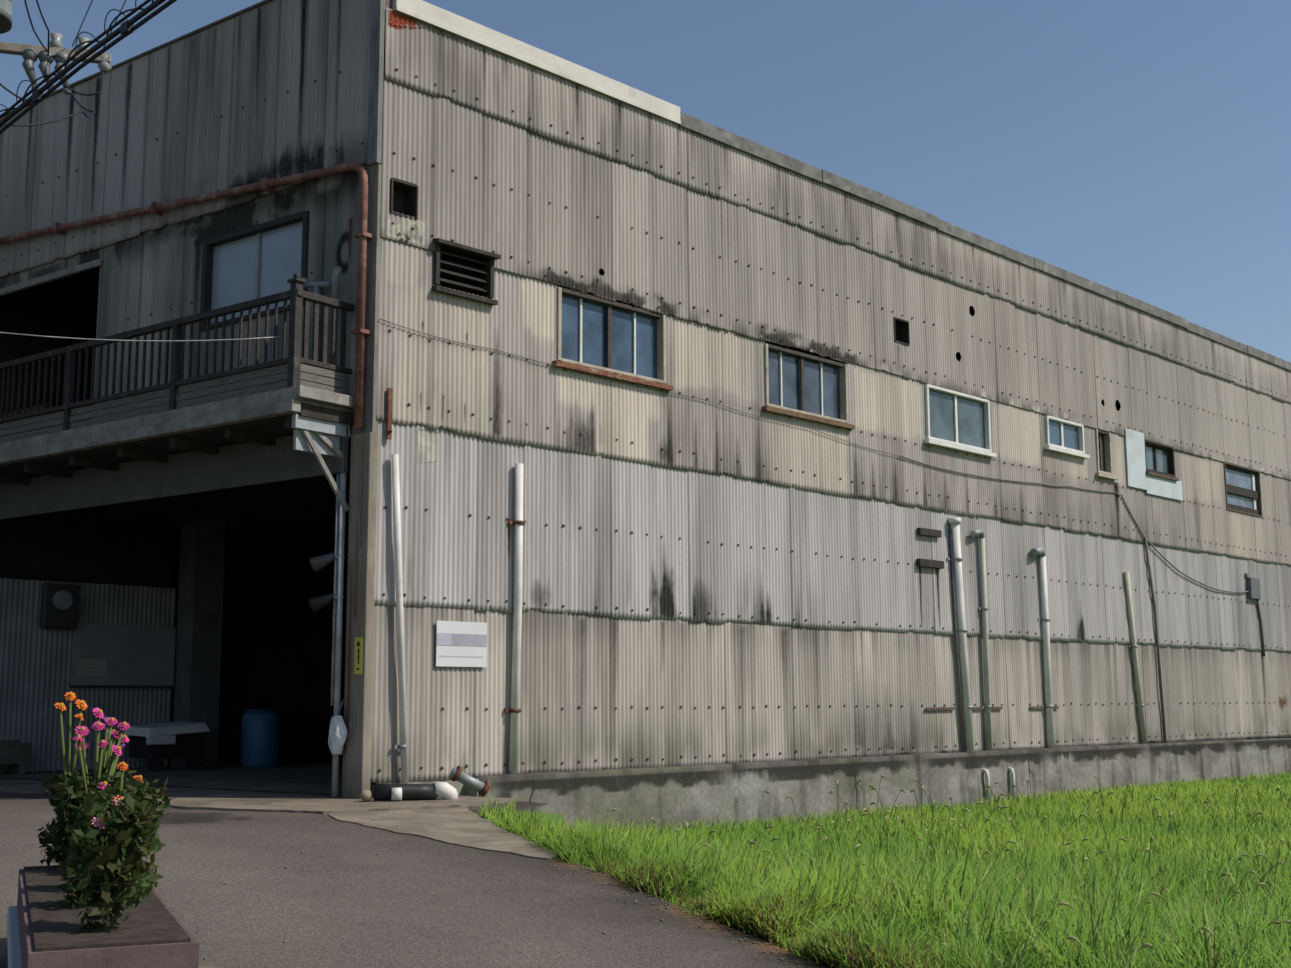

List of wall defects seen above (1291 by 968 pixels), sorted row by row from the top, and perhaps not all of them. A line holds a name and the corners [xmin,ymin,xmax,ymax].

water stain [249,146,342,208]
water stain [184,201,258,276]
rust [337,218,352,272]
water stain [575,414,595,452]
water stain [652,572,674,628]